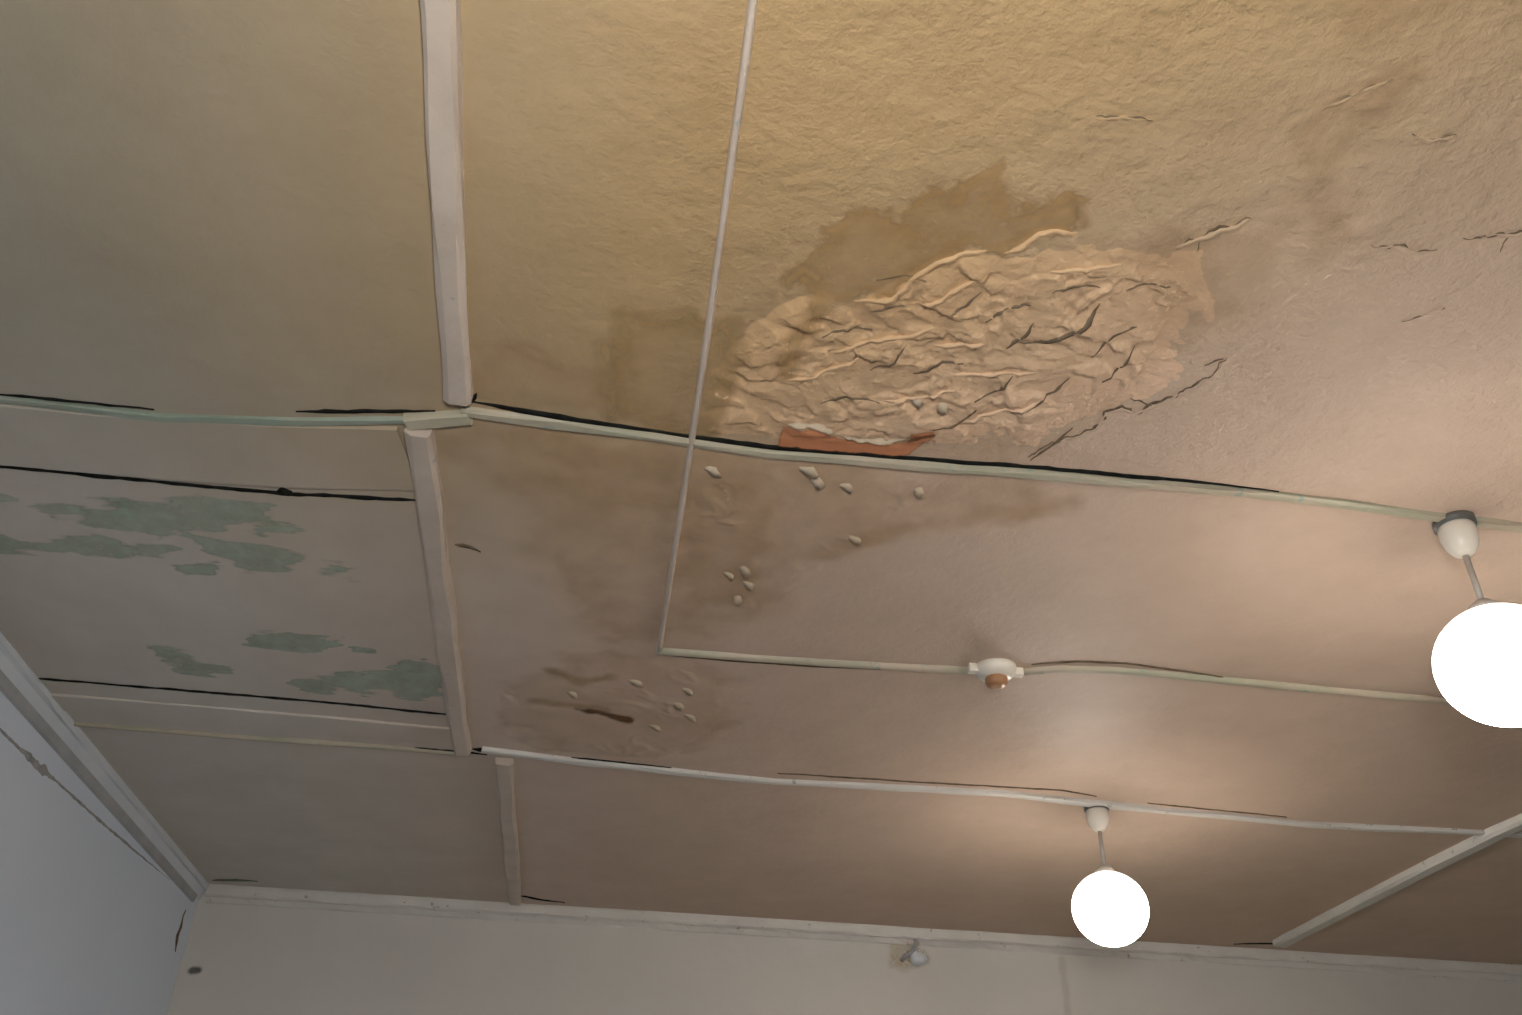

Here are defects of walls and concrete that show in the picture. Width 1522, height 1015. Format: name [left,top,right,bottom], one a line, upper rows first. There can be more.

crack [1321,79,1392,111]
crack [1175,217,1252,252]
crack [1370,230,1522,255]
peeling [0,497,302,575]
peeling [243,633,374,653]
peeling [288,659,443,701]